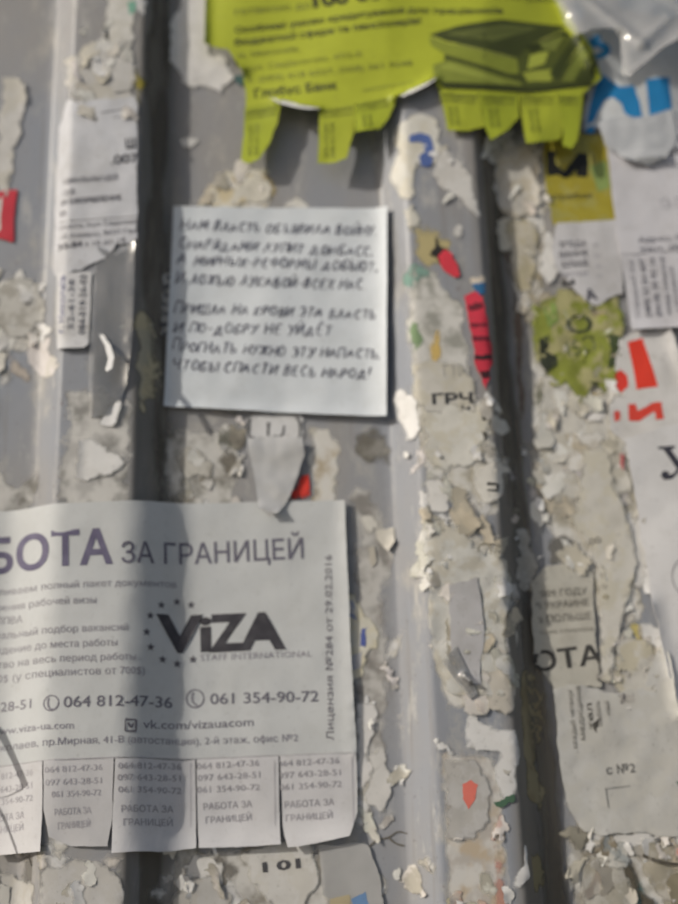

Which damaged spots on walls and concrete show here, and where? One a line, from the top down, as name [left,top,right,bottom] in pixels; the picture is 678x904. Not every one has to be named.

peeling [134,0,148,14]
peeling [75,38,134,121]
peeling [15,269,46,302]
peeling [0,322,59,384]
peeling [469,392,510,462]
peeling [410,472,520,602]
peeling [556,538,592,575]
peeling [642,566,650,594]
peeling [491,815,509,841]
peeling [478,873,515,904]